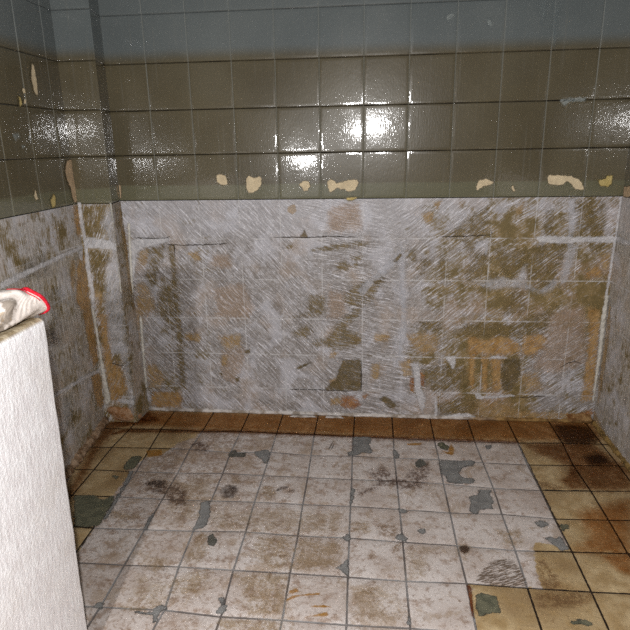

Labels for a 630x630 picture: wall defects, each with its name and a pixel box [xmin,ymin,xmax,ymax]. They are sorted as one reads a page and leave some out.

peeling [216,174,228,186]
peeling [246,176,262,193]
peeling [327,178,359,201]
peeling [476,178,494,191]
peeling [547,174,584,191]
damp [605,198,622,296]
damp [139,317,147,388]
damp [542,425,623,486]
spalling [439,460,475,484]
spalling [73,456,142,527]
spalling [469,489,494,514]
spalling [475,593,501,616]